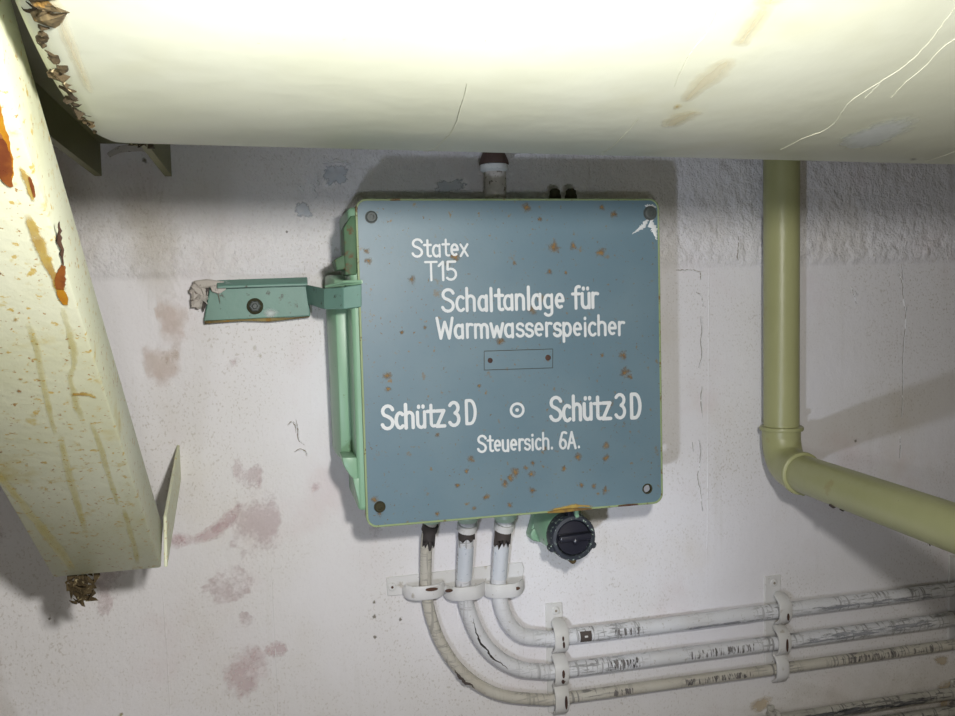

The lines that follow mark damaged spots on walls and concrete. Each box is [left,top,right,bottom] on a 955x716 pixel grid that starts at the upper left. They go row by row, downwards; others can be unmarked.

crack [780,7,955,150]
leakage [806,698,934,716]